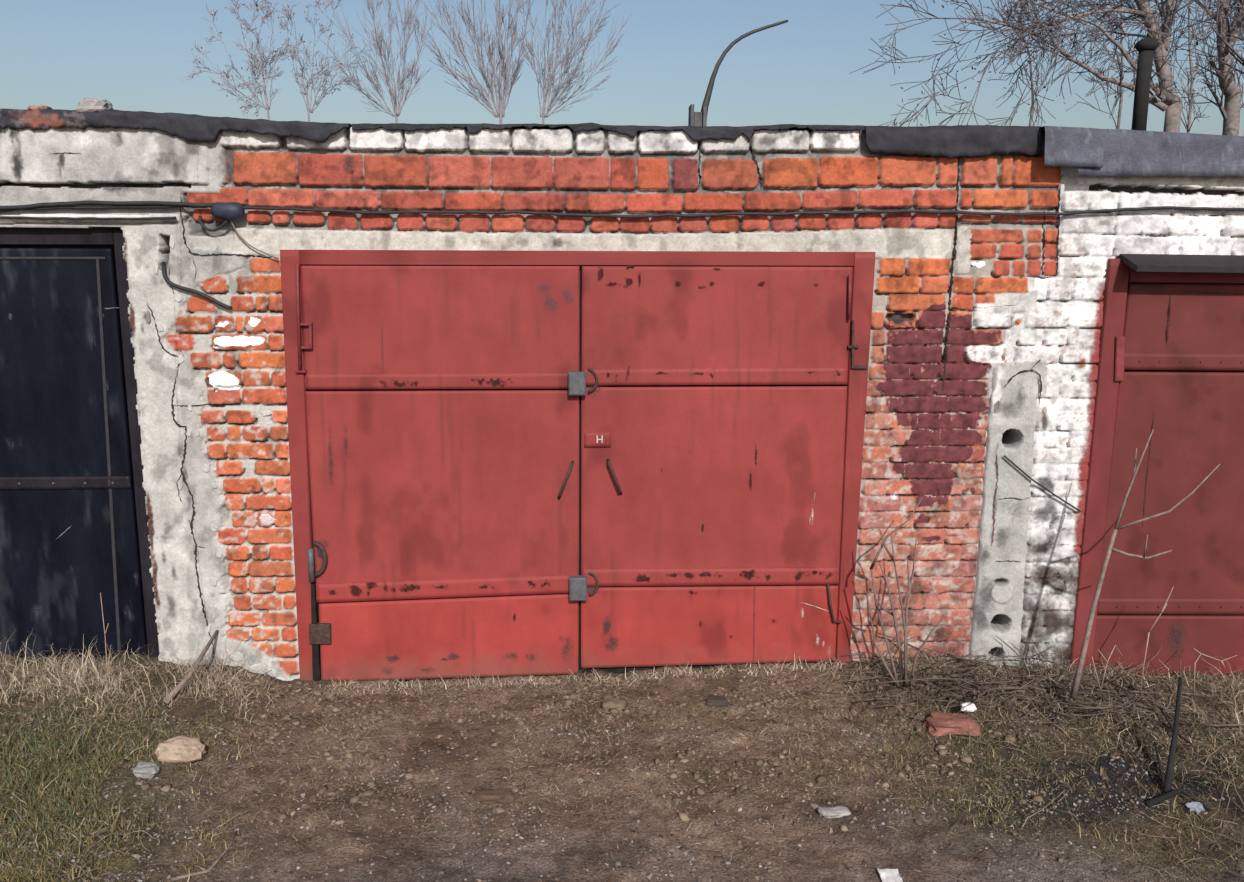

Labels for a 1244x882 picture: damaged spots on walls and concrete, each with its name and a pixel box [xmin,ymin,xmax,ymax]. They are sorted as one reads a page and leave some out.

crack [936,159,976,391]
crack [146,196,279,664]
peeling [876,304,1006,542]
spalling [228,652,288,681]